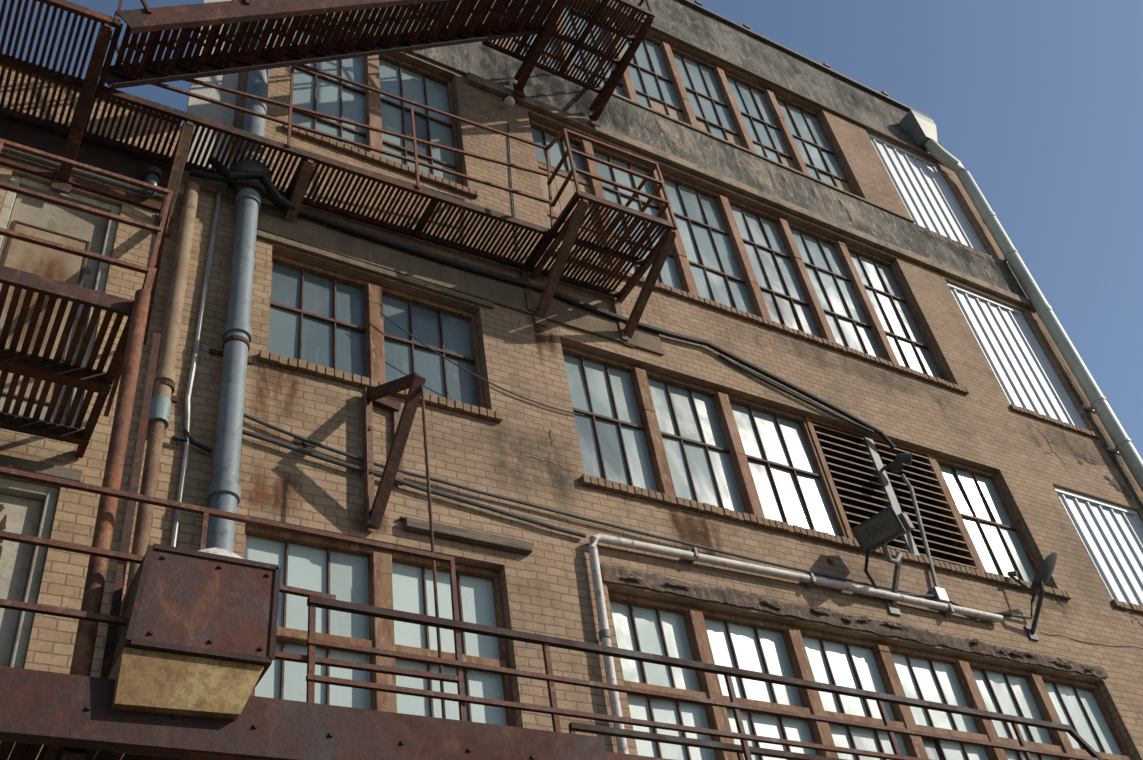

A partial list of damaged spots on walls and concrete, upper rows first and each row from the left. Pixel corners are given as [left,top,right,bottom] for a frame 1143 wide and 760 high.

damp [528,69,629,126]
damp [659,120,690,152]
damp [736,155,787,189]
damp [814,188,863,222]